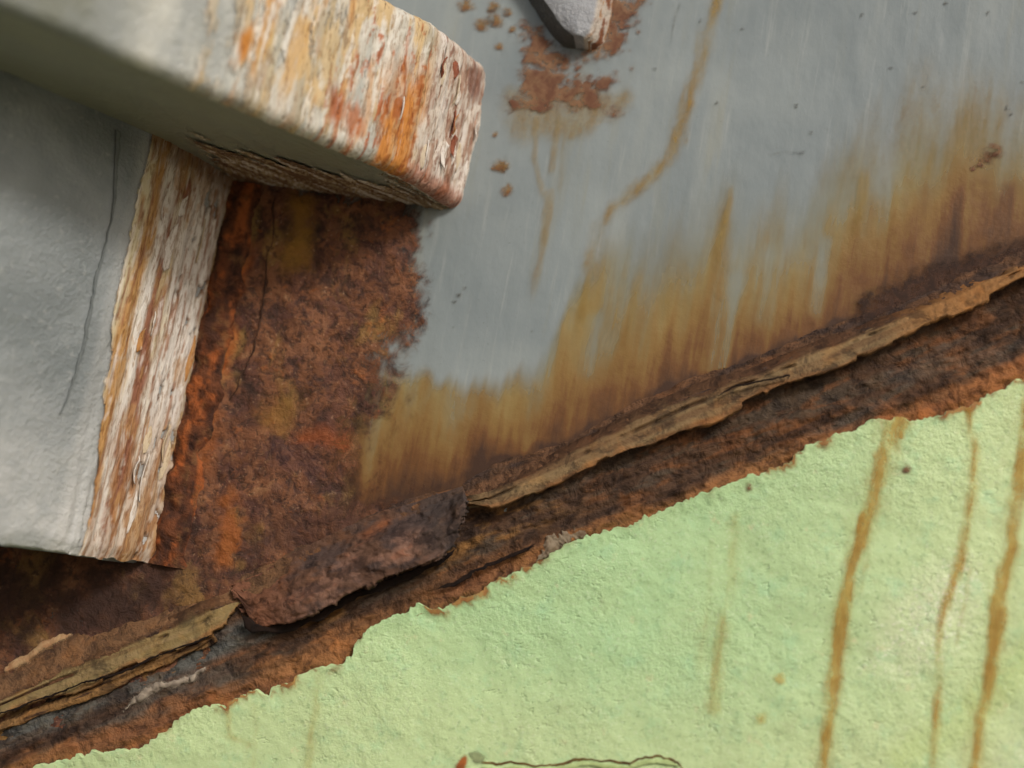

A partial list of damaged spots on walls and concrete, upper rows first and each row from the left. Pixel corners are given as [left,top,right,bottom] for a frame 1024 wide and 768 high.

corrosion [476,0,645,120]
crack [60,130,121,413]
peeling [79,0,485,563]
corrosion [0,134,1024,706]
corrosion [0,695,70,722]
corrosion [822,448,887,768]
corrosion [972,448,1024,768]